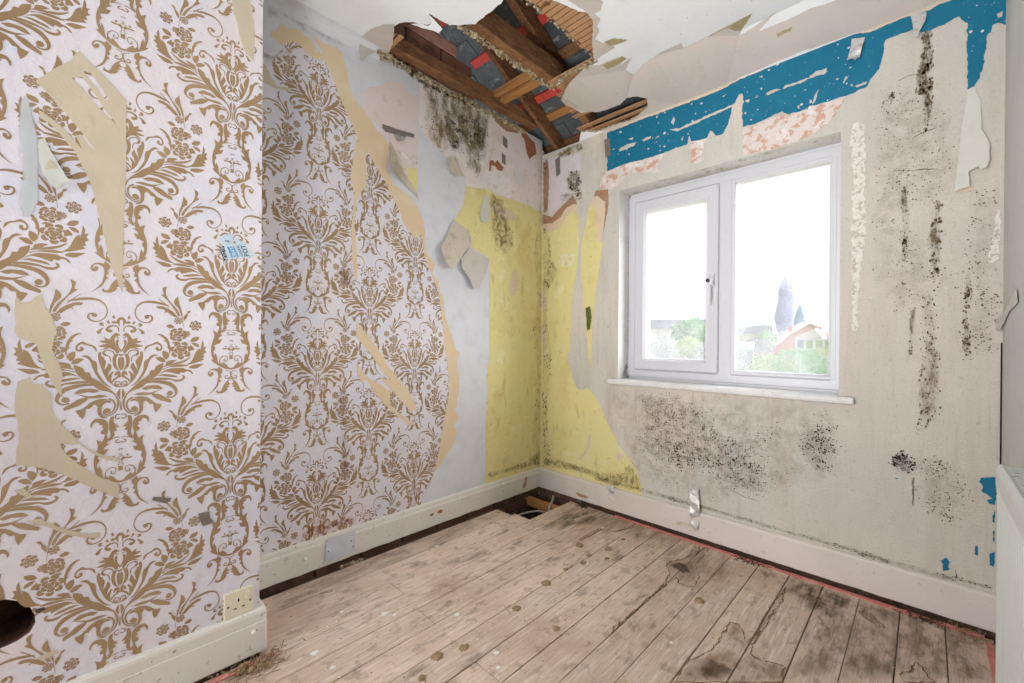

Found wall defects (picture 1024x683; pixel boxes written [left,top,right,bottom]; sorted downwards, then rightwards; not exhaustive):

leakage [410,69,489,178]
flaking render [361,0,943,241]
leakage [869,31,1002,434]
leakage [518,383,842,504]
leakage [888,450,974,525]
spalling [0,599,35,648]